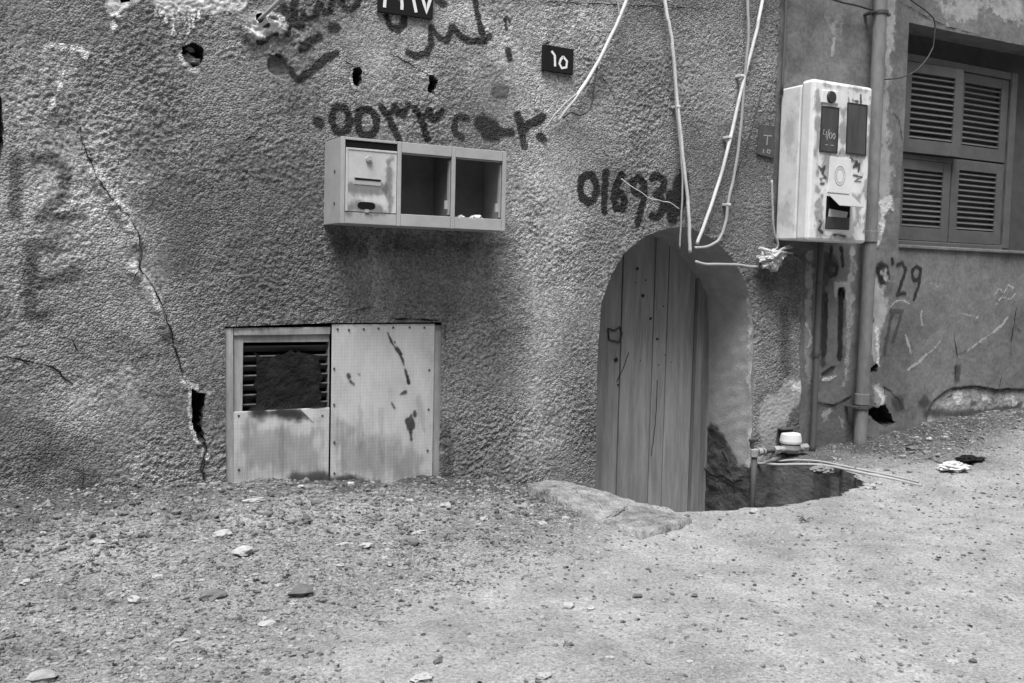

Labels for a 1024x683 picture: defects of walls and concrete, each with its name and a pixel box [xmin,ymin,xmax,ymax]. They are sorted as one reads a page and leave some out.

spalling [179,53,201,74]
crack [76,118,198,390]
crack [1,357,84,391]
spalling [187,384,211,446]
spalling [868,384,895,428]
flaking render [925,387,1024,422]
crack [196,442,210,481]